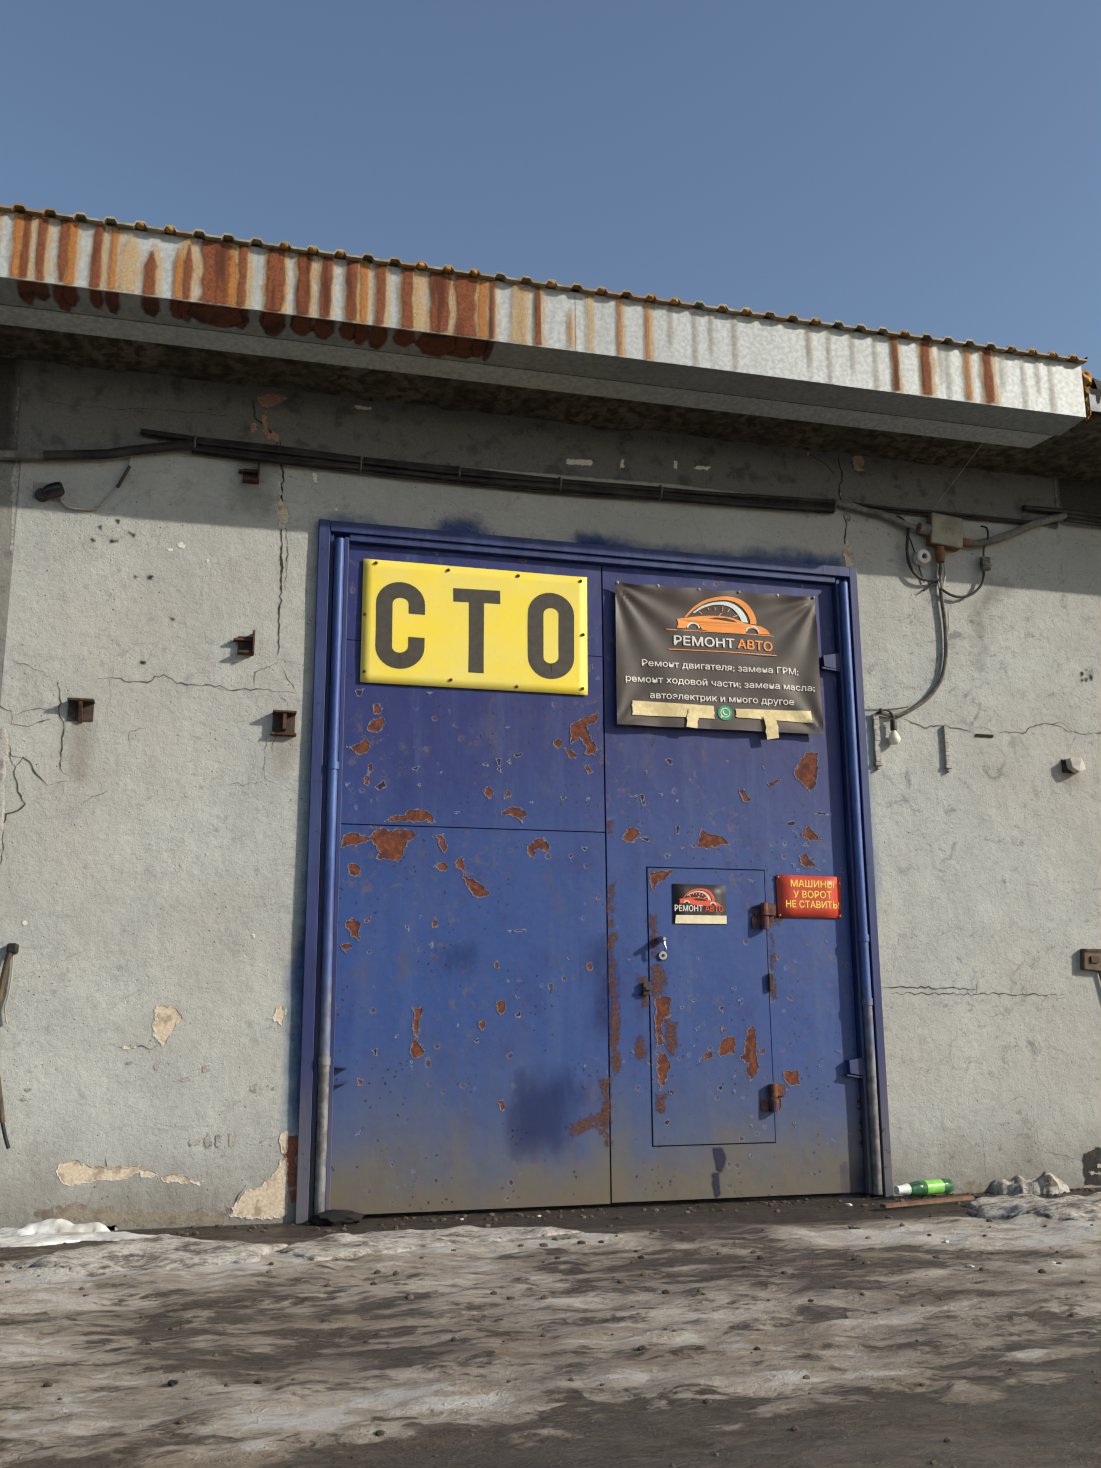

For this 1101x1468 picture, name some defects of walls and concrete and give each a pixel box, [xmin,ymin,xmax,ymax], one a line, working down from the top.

rust [0,214,544,361]
rust [891,336,902,391]
rust [918,342,935,395]
rust [964,347,1000,403]
crack [47,401,294,704]
crack [0,663,107,864]
rust [346,703,386,786]
rust [553,710,599,774]
crack [865,708,1101,735]
rust [340,808,490,898]
rust [566,884,678,1147]
spalling [34,1130,298,1227]